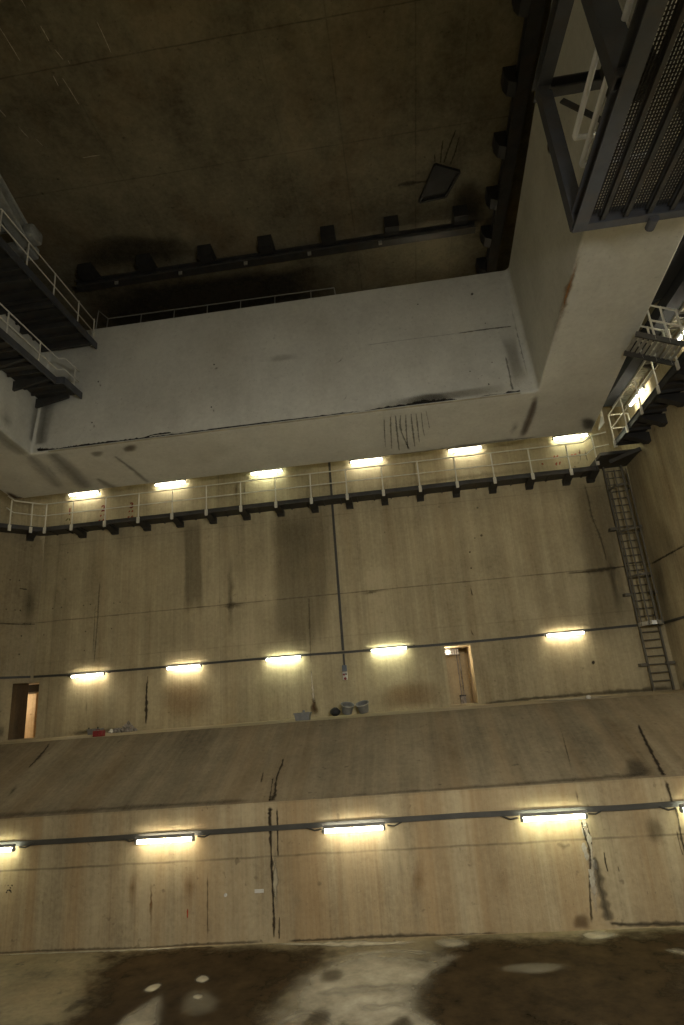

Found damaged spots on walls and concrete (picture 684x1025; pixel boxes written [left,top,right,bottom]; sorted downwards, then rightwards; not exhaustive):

crack [37,399,457,451]
crack [142,678,150,723]
crack [638,726,684,854]
crack [261,759,284,938]
leakage [10,922,684,1025]